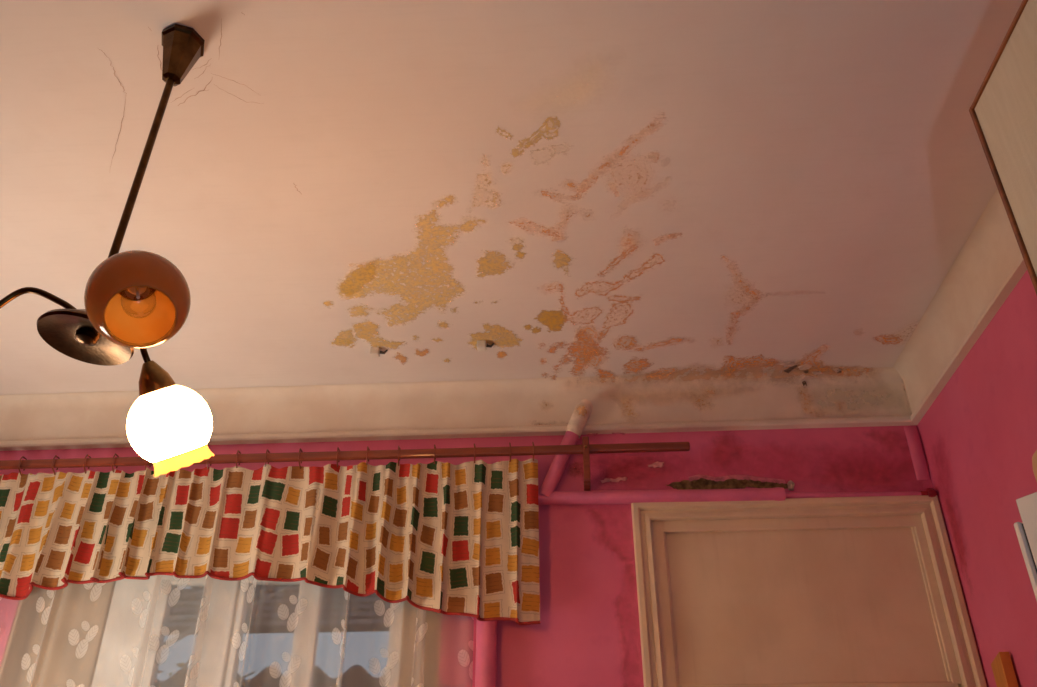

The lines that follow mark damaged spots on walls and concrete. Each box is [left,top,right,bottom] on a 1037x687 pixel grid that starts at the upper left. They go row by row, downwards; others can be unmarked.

crack [172,13,264,106]
spalling [666,474,794,491]